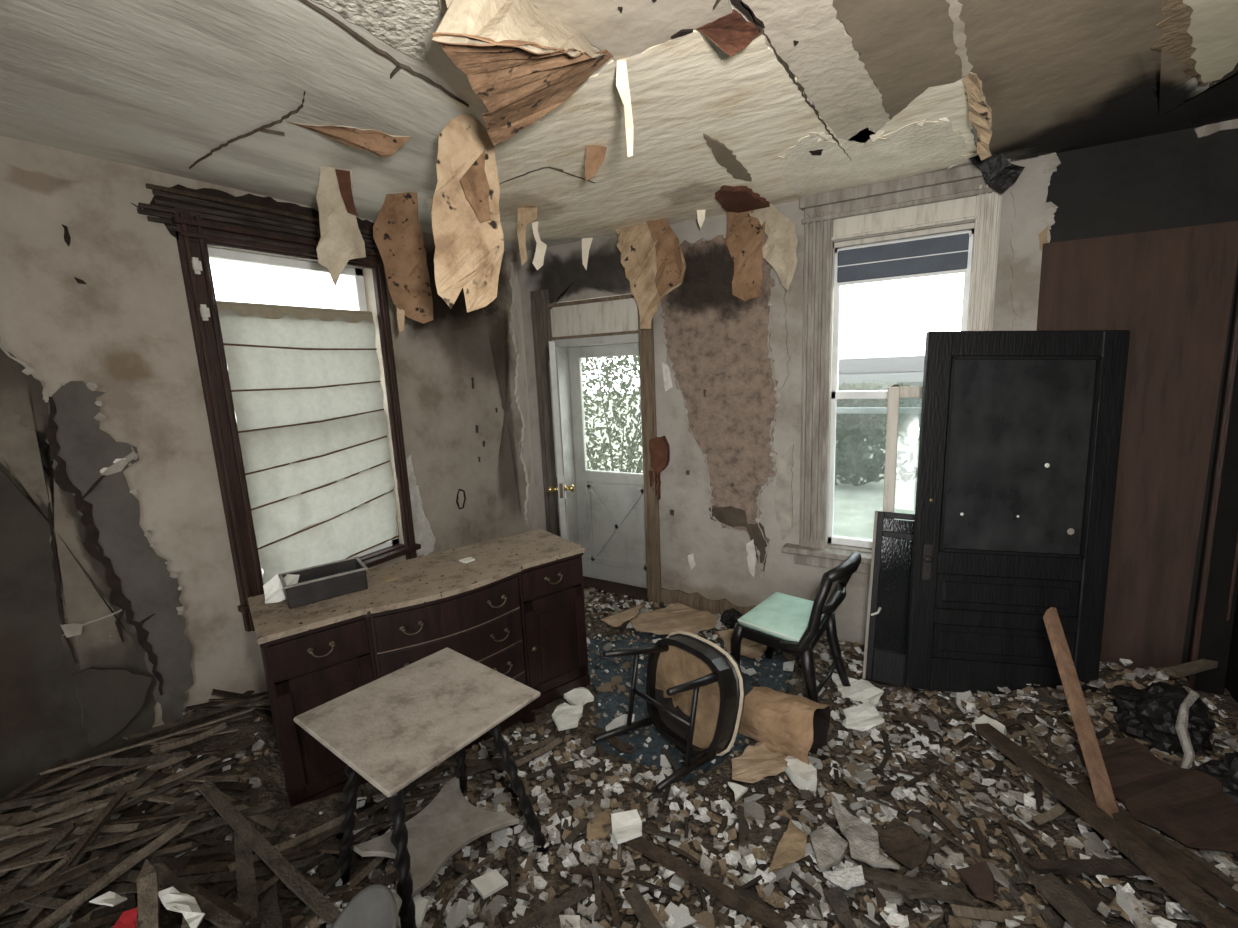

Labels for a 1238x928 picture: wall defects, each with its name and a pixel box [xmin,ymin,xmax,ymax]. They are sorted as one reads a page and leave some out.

crack [189,91,305,169]
peeling [285,121,411,158]
peeling [312,0,441,66]
crack [300,0,469,107]
peeling [494,0,1061,331]
spalling [1206,63,1238,90]
spalling [62,224,71,246]
spalling [660,234,790,579]
spalling [0,326,193,799]
crack [44,397,163,695]